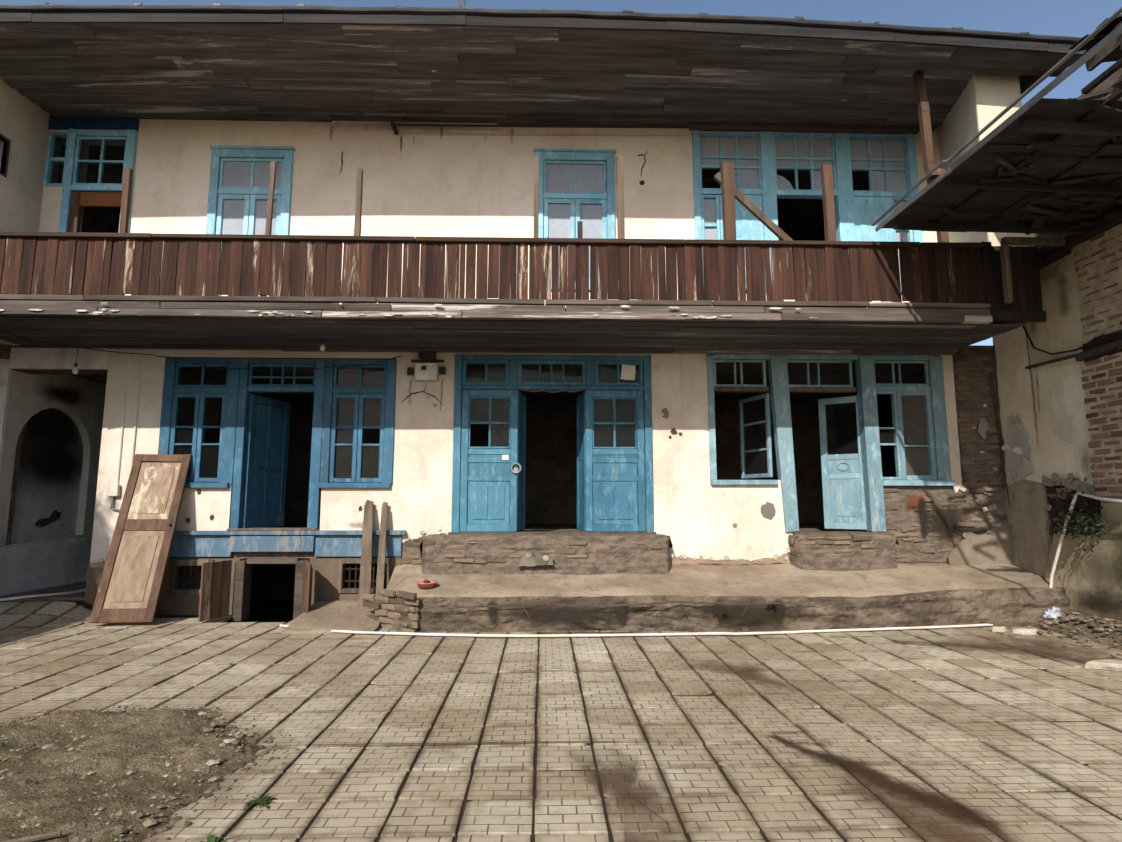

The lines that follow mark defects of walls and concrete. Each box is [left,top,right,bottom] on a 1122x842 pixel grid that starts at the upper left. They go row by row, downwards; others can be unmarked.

water stain [28,410,73,444]
water stain [918,497,964,536]
spalling [1041,473,1122,531]
water stain [1074,588,1122,613]